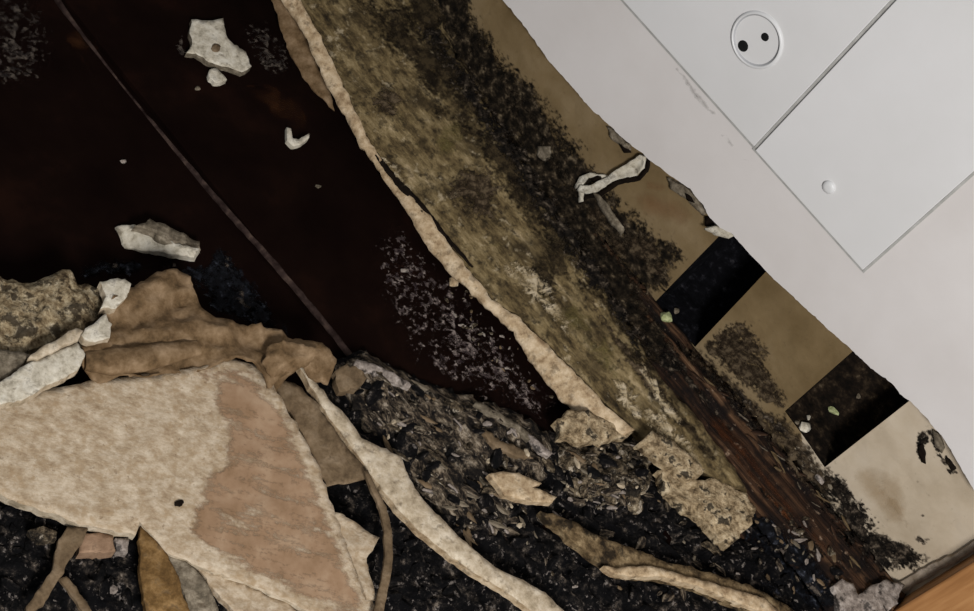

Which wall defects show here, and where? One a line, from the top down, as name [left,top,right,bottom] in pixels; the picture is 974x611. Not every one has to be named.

peeling [574,126,646,236]
spalling [667,177,734,239]
damp [357,0,928,573]
spalling [916,429,958,474]